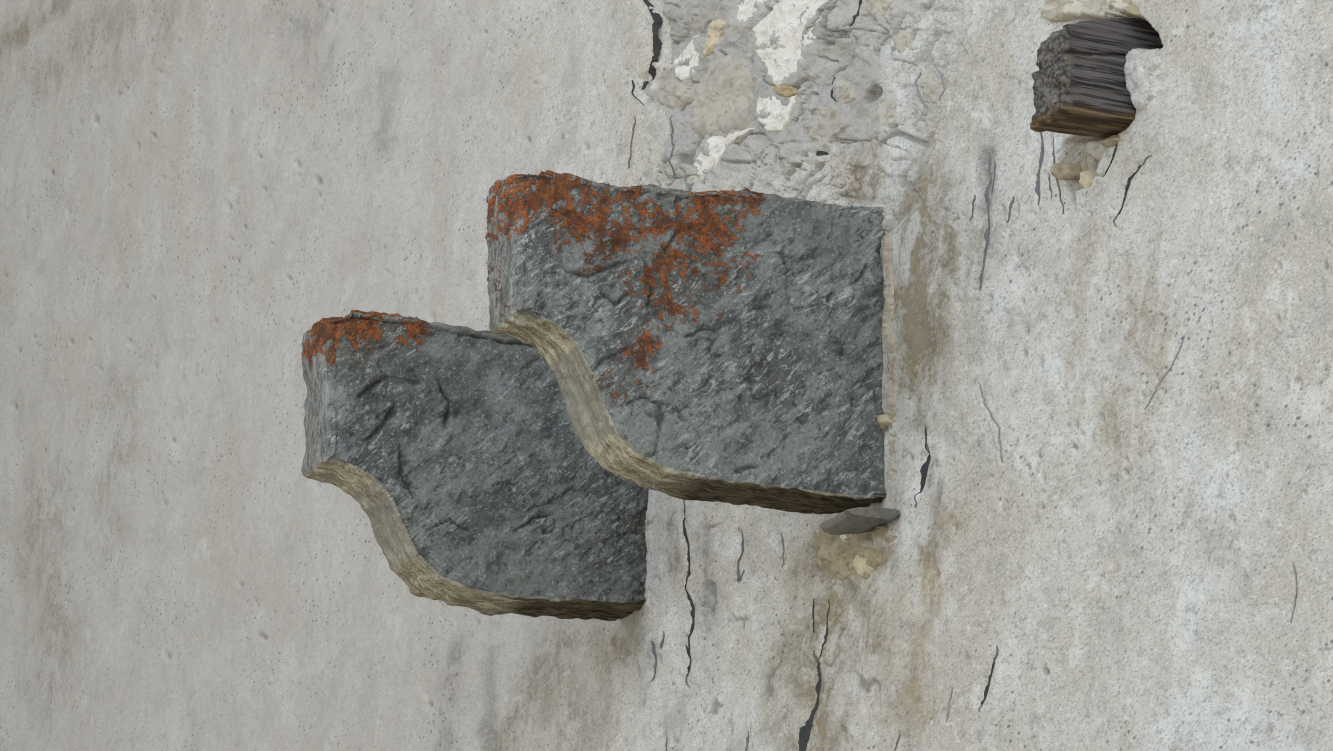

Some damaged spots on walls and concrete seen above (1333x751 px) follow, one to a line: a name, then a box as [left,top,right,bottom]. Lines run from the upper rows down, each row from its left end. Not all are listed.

flaking render [1041,0,1144,23]
crack [627,0,675,176]
flaking render [646,0,981,235]
flaking render [1124,48,1161,112]
flaking render [1050,135,1121,188]
crack [1102,145,1152,227]
crack [914,426,931,508]
crack [651,500,695,688]
crack [798,599,830,751]
crack [946,645,999,722]